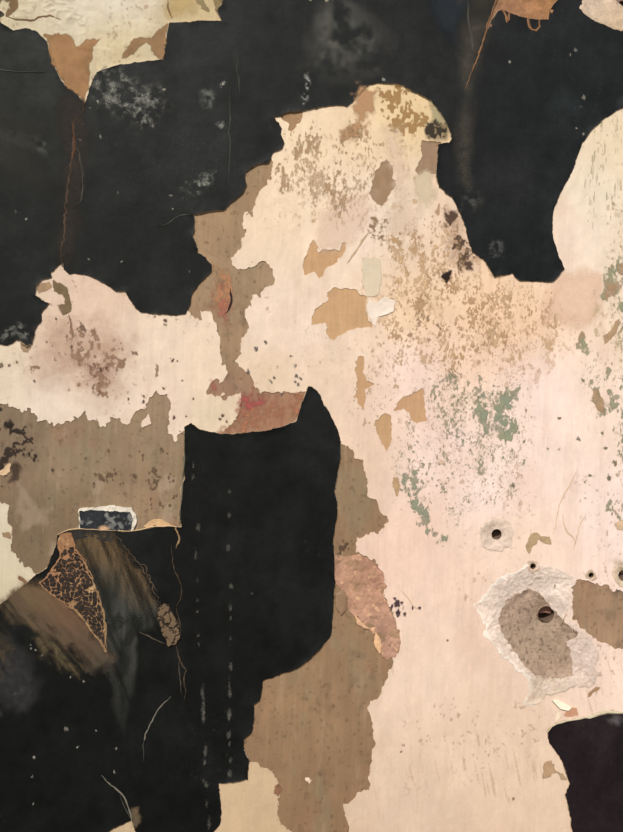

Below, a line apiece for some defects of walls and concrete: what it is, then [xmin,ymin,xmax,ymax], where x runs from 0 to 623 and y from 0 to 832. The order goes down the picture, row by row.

spalling [579,0,623,31]
peeling [0,0,222,103]
peeling [61,530,115,542]
peeling [78,505,137,531]
peeling [143,519,172,527]
peeling [543,761,557,779]
peeling [214,762,292,832]
peeling [108,821,136,832]